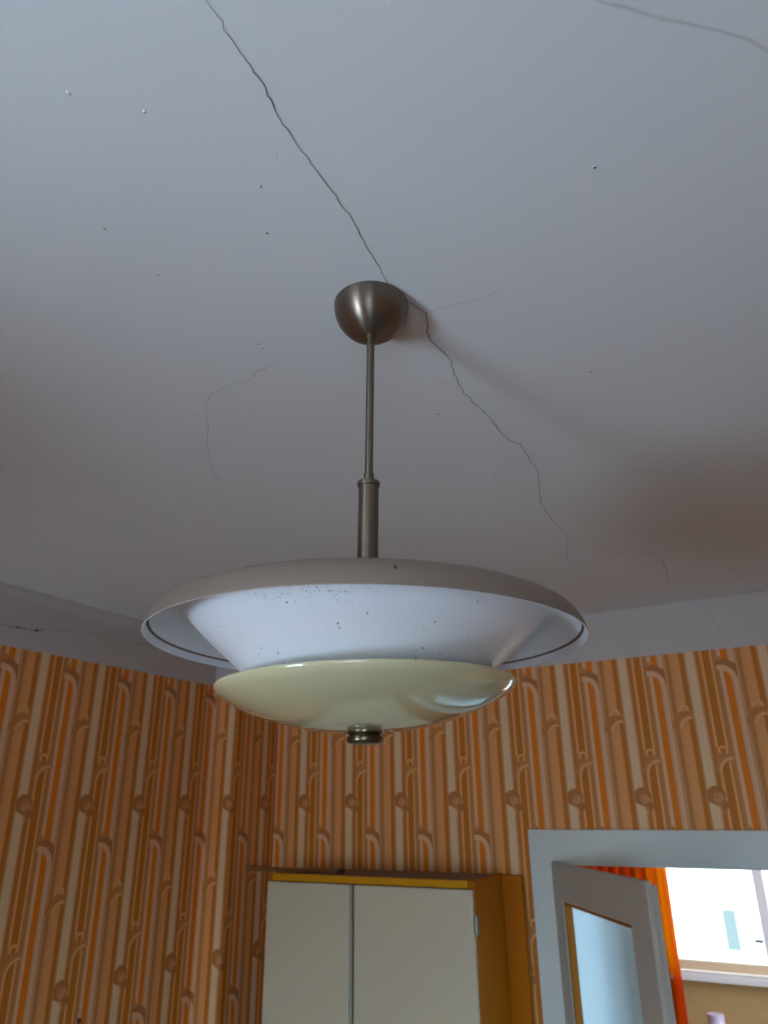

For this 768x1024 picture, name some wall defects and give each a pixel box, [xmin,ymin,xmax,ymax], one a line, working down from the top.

crack [206,0,387,282]
crack [408,300,569,538]